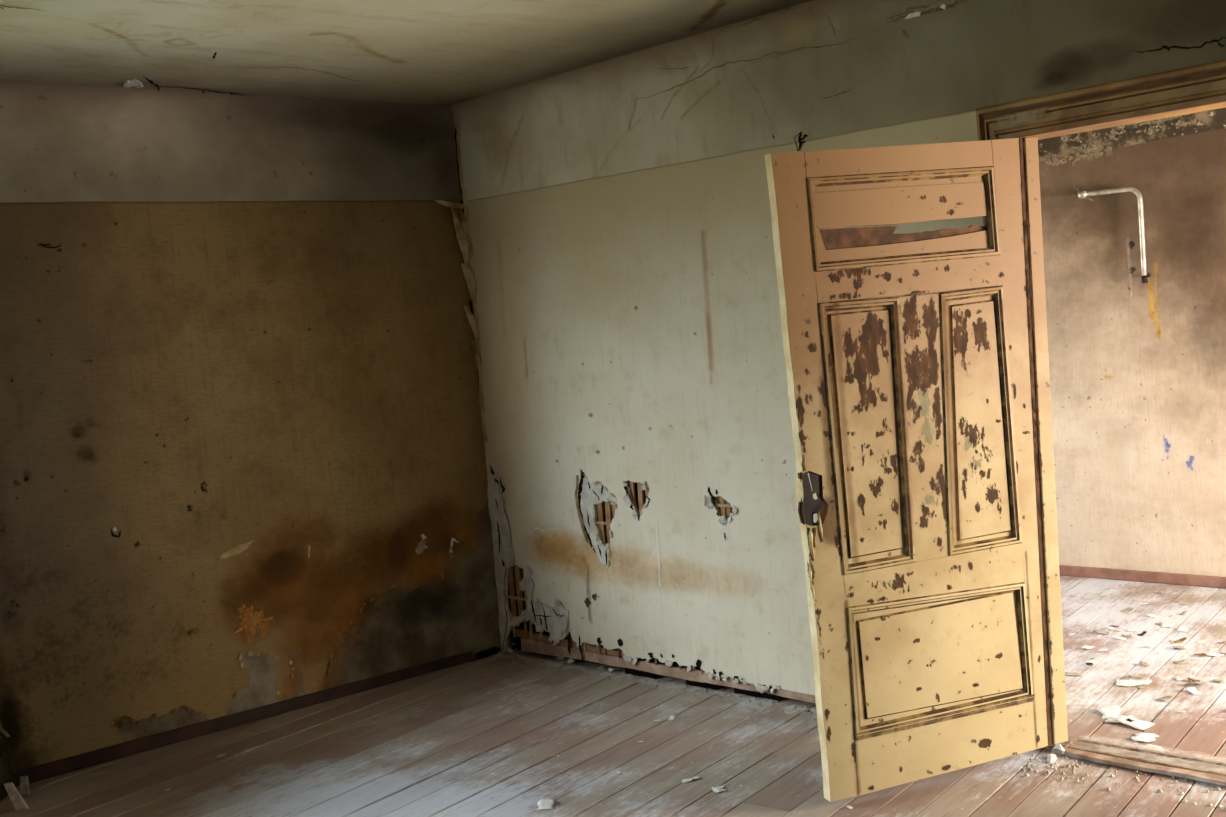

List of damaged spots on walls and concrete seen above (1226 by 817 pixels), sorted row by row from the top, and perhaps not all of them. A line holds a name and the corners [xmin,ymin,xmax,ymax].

crack [632,0,969,101]
crack [1127,37,1226,53]
flaking render [322,466,831,742]